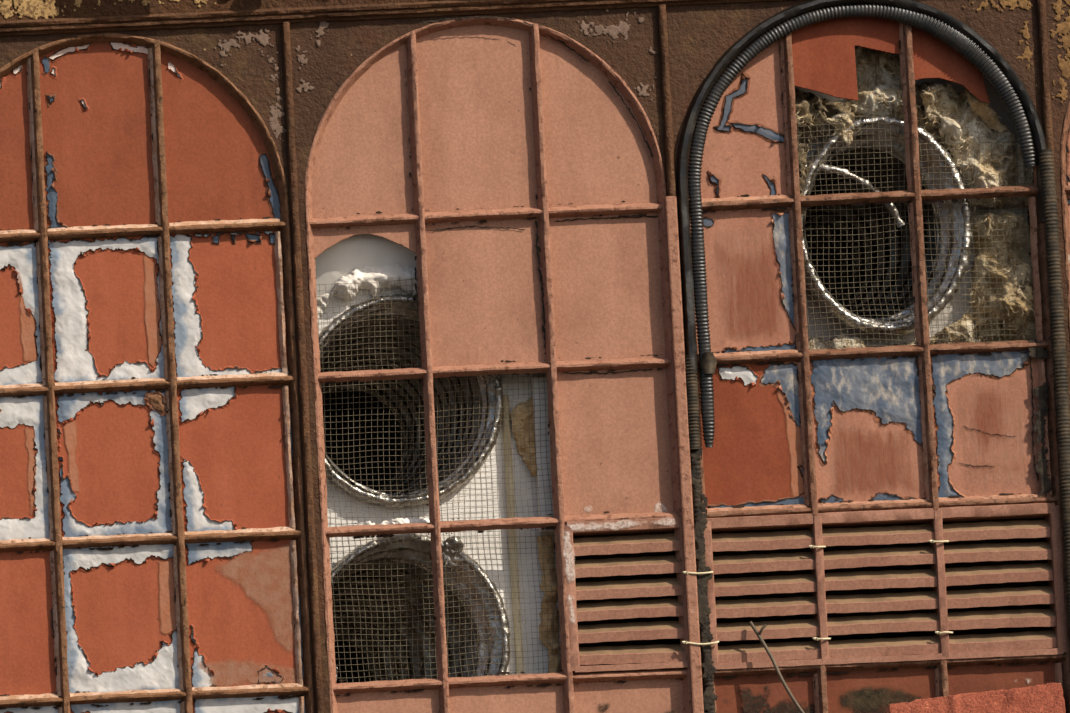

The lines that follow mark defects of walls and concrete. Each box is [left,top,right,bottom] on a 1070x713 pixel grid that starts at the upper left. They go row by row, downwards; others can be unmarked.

peeling [0,0,82,20]
peeling [41,43,93,79]
peeling [107,42,148,56]
peeling [962,0,1033,76]
peeling [1050,0,1070,105]
peeling [713,71,784,143]
peeling [708,170,722,198]
peeling [761,173,777,195]
peeling [715,211,1049,501]
peeling [0,151,305,713]
water stain [740,686,815,713]
water stain [841,687,921,713]